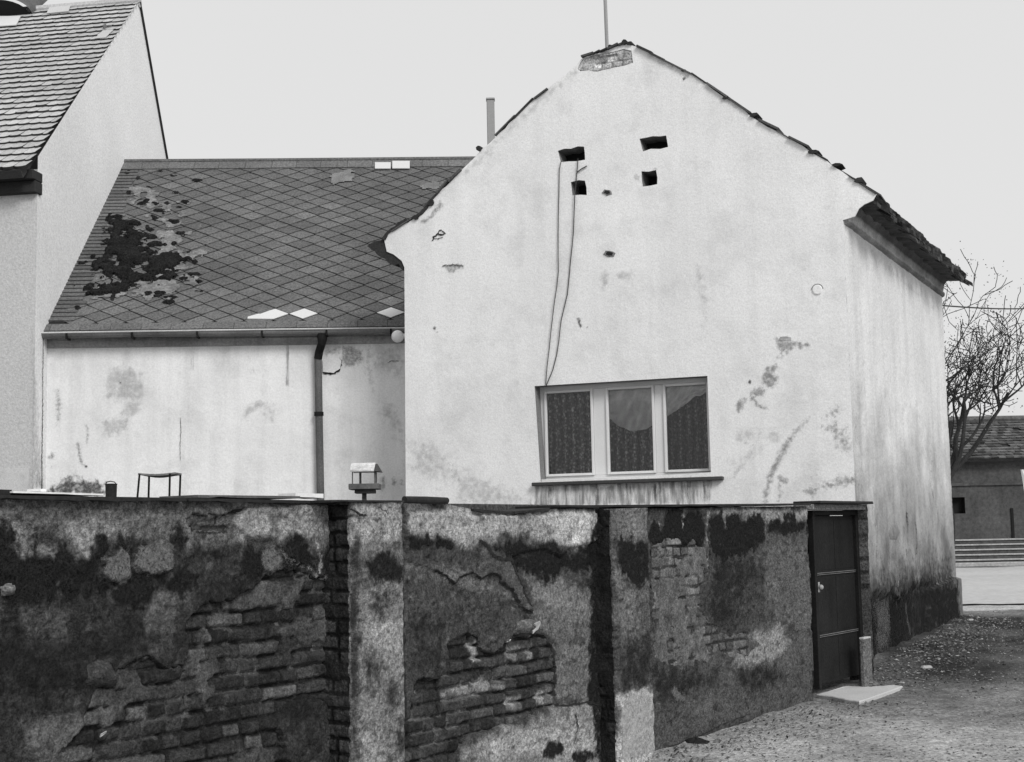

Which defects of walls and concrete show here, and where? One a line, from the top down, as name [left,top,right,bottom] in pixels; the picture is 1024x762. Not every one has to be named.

flaking render [578,49,633,72]
damp [0,518,221,661]
flaking render [55,543,329,762]
damp [240,544,264,582]
damp [286,532,330,581]
damp [409,533,463,550]
flaking render [387,621,555,762]
crack [435,539,599,744]
damp [495,522,602,760]
damp [582,482,809,625]
peeling [650,538,759,667]
damp [870,560,960,658]